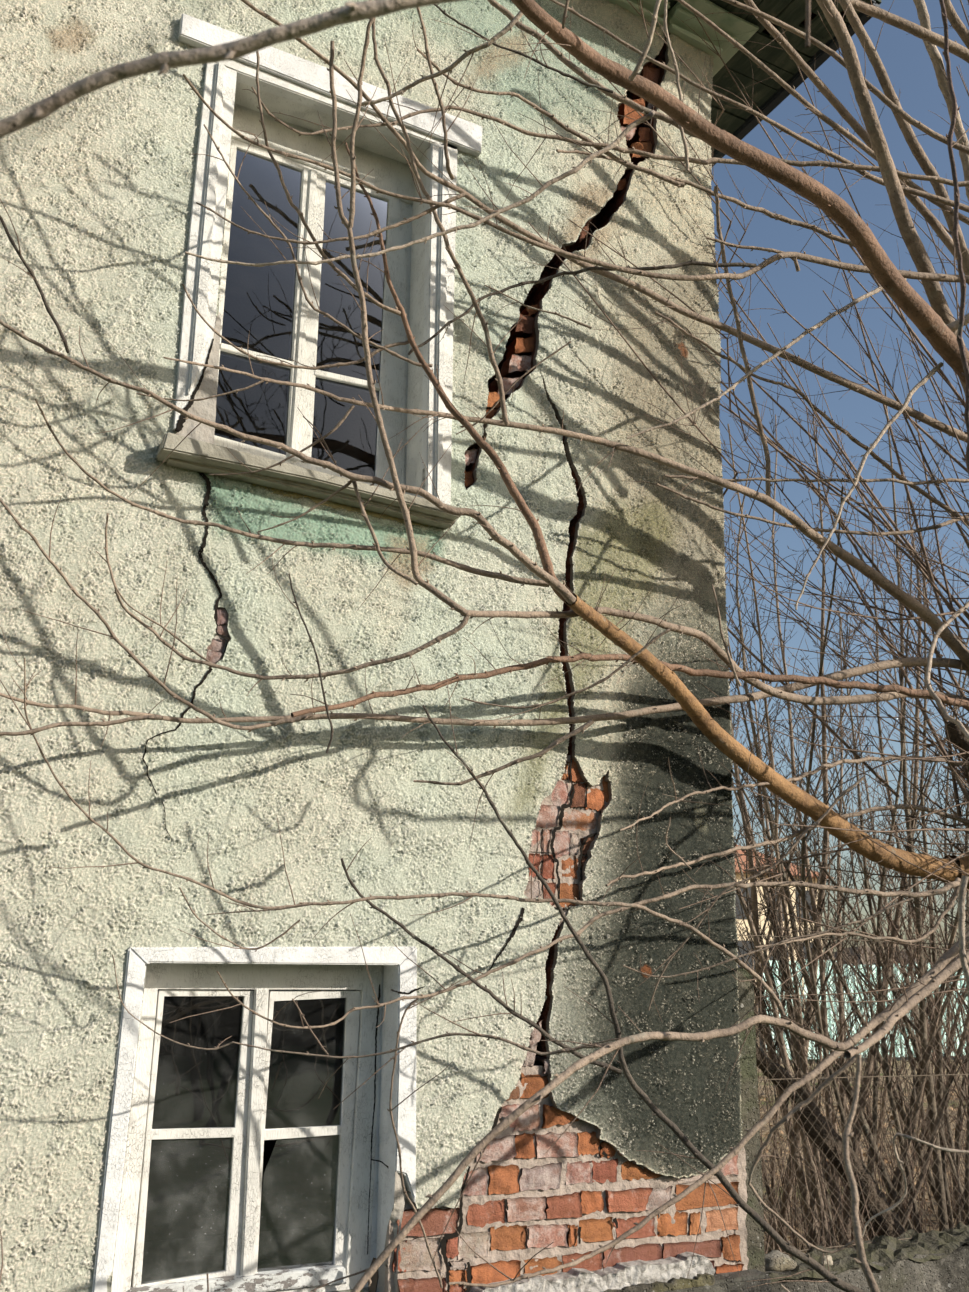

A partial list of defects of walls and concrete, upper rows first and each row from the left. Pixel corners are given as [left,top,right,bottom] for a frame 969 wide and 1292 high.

crack [464,31,667,489]
crack [555,413,585,763]
crack [142,668,213,840]
crack [488,907,525,971]
crack [520,908,568,1078]
flaking render [524,755,609,908]
water stain [569,611,742,1175]
flaking render [368,1065,749,1292]